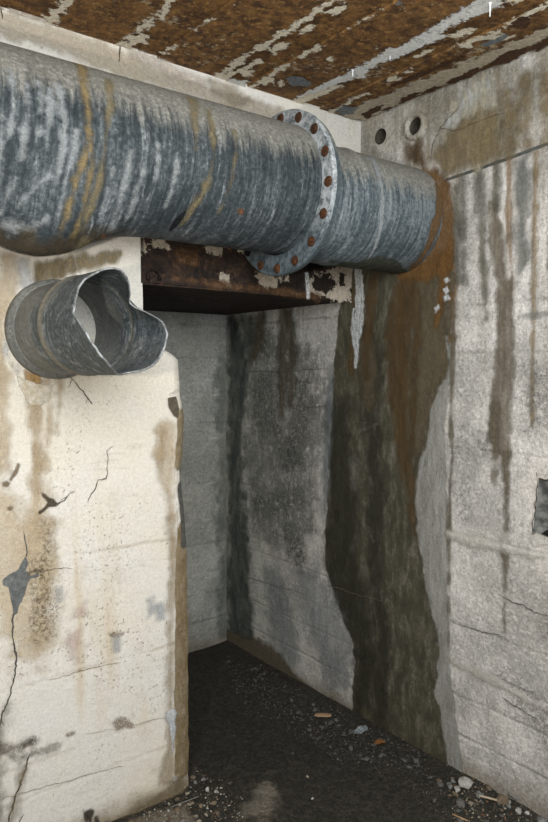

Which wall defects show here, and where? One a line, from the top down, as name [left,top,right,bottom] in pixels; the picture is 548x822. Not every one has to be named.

corrosion [361,67,479,118]
corrosion [391,55,465,86]
corrosion [492,37,548,65]
corrosion [398,139,456,326]
leakage [19,251,122,287]
leakage [247,66,548,772]
spalling [38,493,59,514]
crack [57,446,113,504]
leakage [218,548,312,688]
crack [0,613,17,725]
crack [0,754,123,822]
leakage [120,703,185,819]